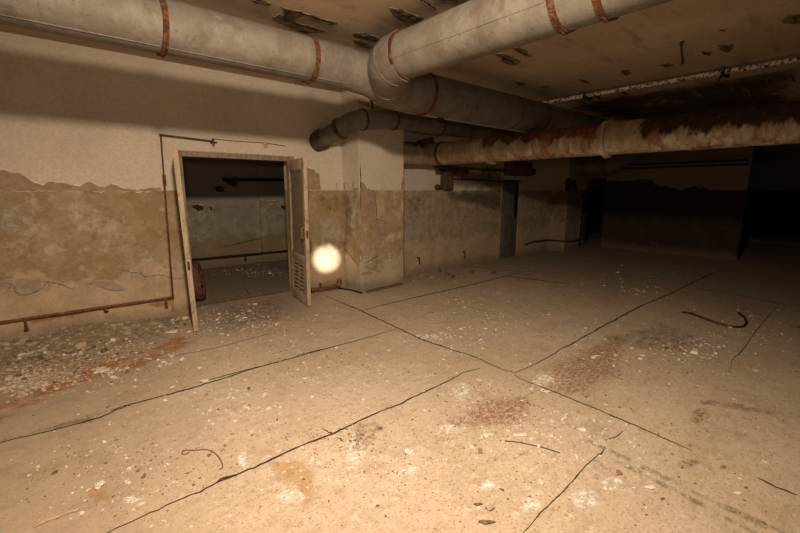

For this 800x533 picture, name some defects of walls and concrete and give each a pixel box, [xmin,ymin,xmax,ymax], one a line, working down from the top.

spalling [250,0,337,34]
spalling [388,7,424,24]
spalling [494,47,534,65]
peeling [0,168,162,193]
peeling [307,167,321,190]